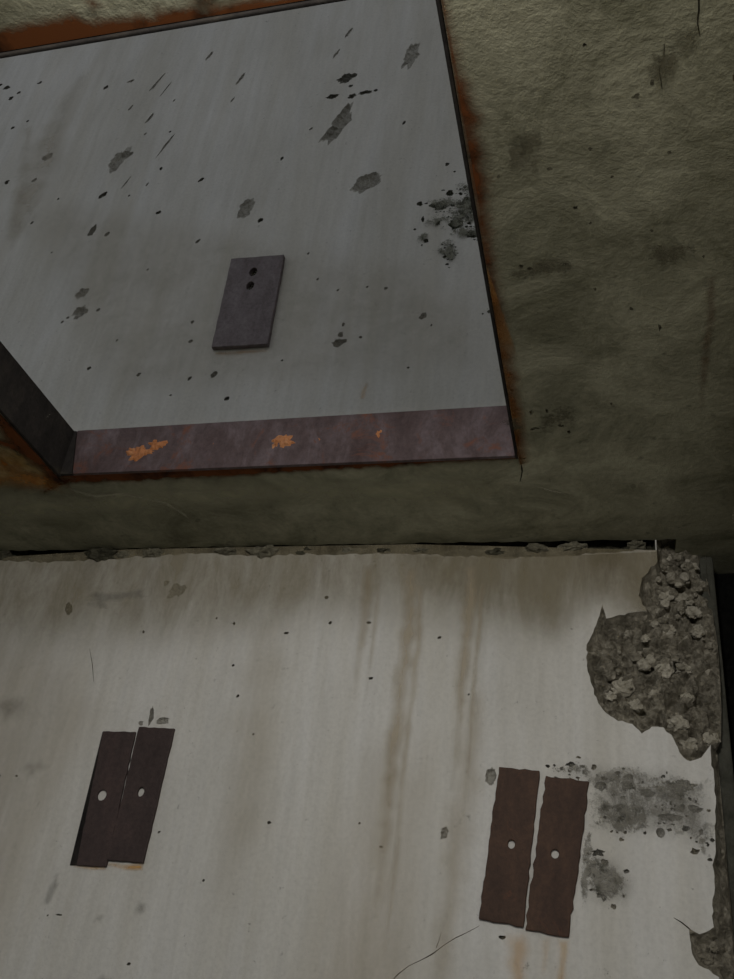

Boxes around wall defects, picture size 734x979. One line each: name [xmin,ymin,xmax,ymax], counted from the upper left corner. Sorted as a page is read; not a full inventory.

rust [0,0,526,492]
spalling [545,539,734,979]